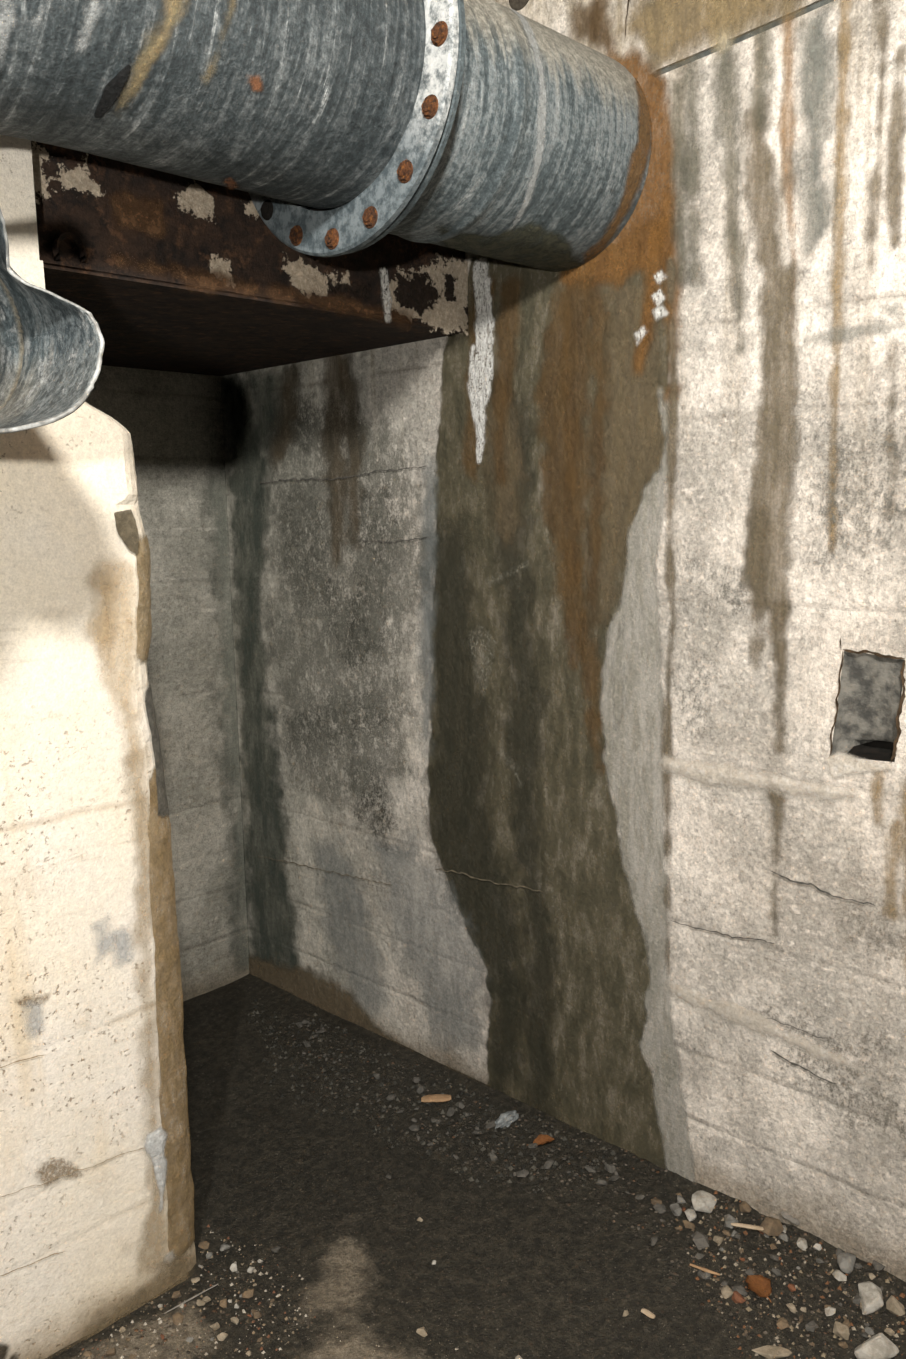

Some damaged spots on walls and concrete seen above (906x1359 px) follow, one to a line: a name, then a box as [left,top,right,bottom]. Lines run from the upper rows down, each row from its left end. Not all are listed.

rust [112,193,165,237]
rust [561,3,678,370]
damp [801,15,833,250]
damp [867,16,905,246]
rust [117,256,517,481]
damp [629,0,802,681]
damp [270,62,709,1182]
damp [232,811,412,1051]
damp [769,785,784,854]
crack [0,1251,65,1276]
crack [1,1147,146,1197]
damp [66,1118,190,1350]